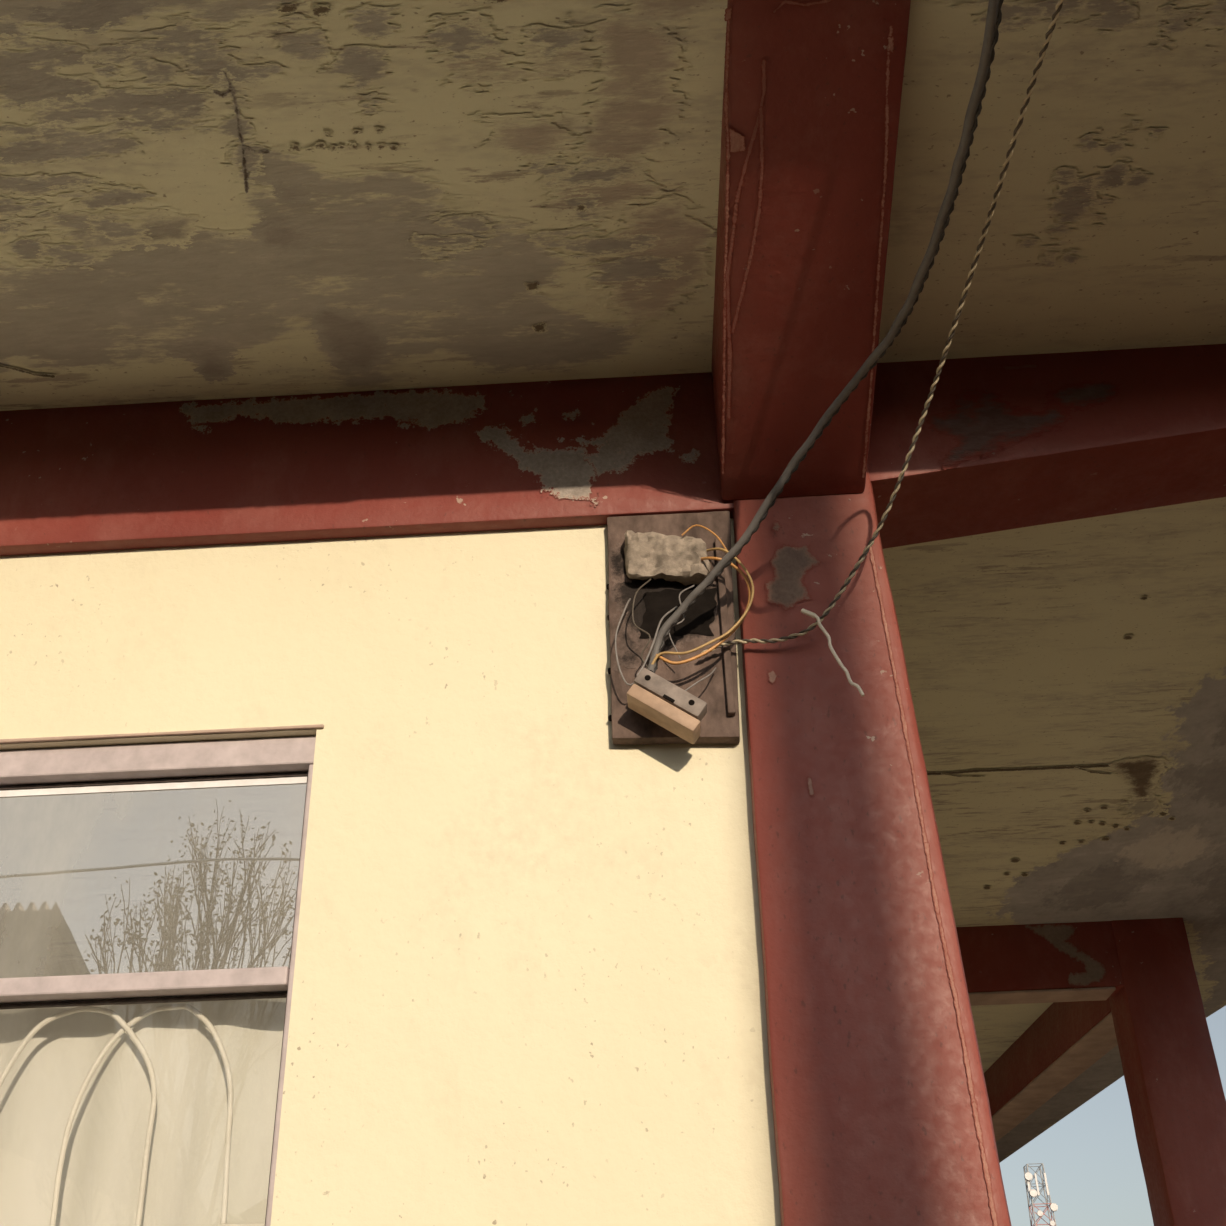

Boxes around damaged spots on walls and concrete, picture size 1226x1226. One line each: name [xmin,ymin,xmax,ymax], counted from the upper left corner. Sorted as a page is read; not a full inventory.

crack [213,71,270,193]
peeling [0,0,702,507]
spalling [721,7,746,474]
spalling [871,25,894,352]
peeling [764,520,822,611]
crack [927,764,1112,777]
damp [985,663,1226,1017]
peeling [1024,923,1109,989]
damp [996,1045,1124,1161]